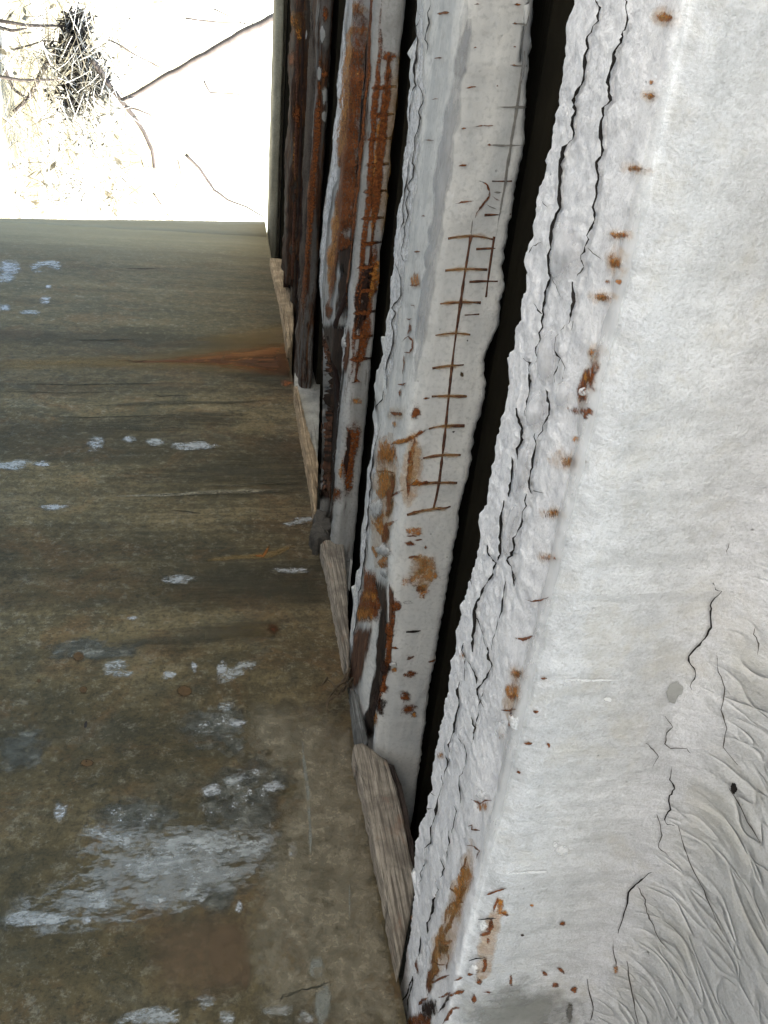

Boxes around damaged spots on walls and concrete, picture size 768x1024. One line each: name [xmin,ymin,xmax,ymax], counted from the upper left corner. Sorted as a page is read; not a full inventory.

rust [290,0,383,383]
damp [0,460,49,470]
rust [338,423,362,494]
rust [369,397,430,578]
crack [402,0,629,1011]
rust [567,349,600,419]
crack [688,583,760,842]
damp [6,911,69,925]
damp [83,892,110,922]
damp [91,739,288,914]
rust [406,845,490,1024]
crack [613,718,719,1022]